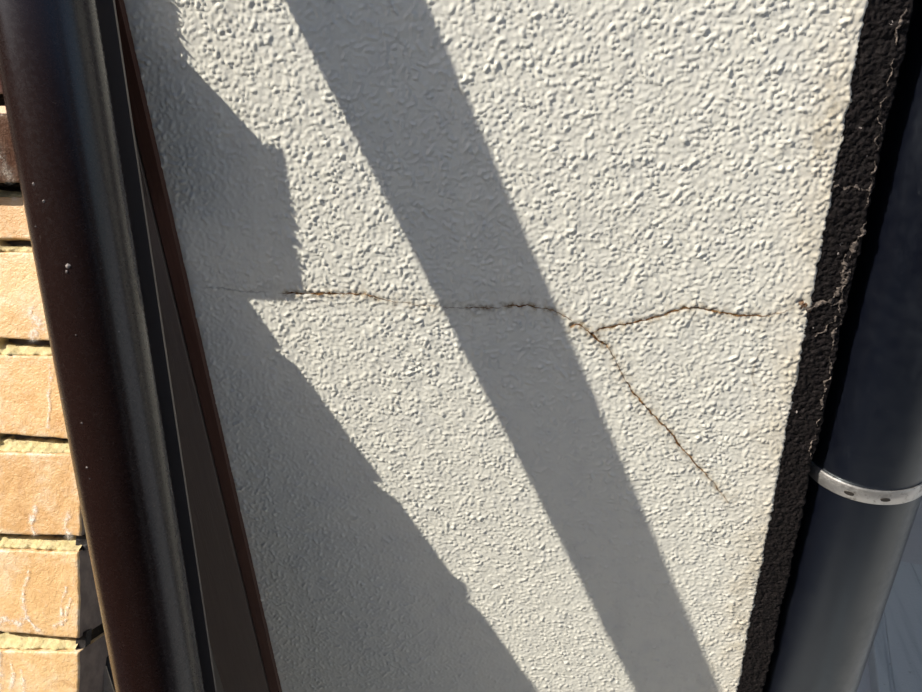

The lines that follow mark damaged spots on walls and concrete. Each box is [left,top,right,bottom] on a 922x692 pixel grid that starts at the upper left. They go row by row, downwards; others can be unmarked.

crack [283,291,802,511]